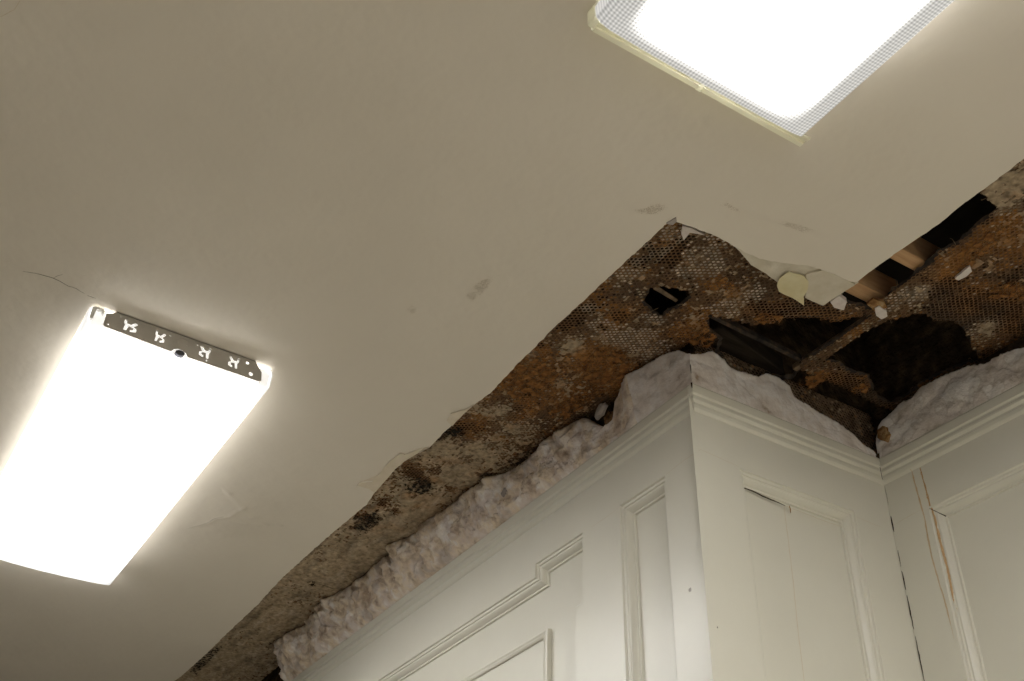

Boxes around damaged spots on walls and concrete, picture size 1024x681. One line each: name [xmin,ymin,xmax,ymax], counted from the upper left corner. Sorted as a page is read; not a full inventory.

flaking render [666,217,705,240]
flaking render [955,265,972,280]
flaking render [830,294,847,310]
flaking render [866,297,887,319]
water stain [354,512,379,534]
flaking render [273,348,1024,681]